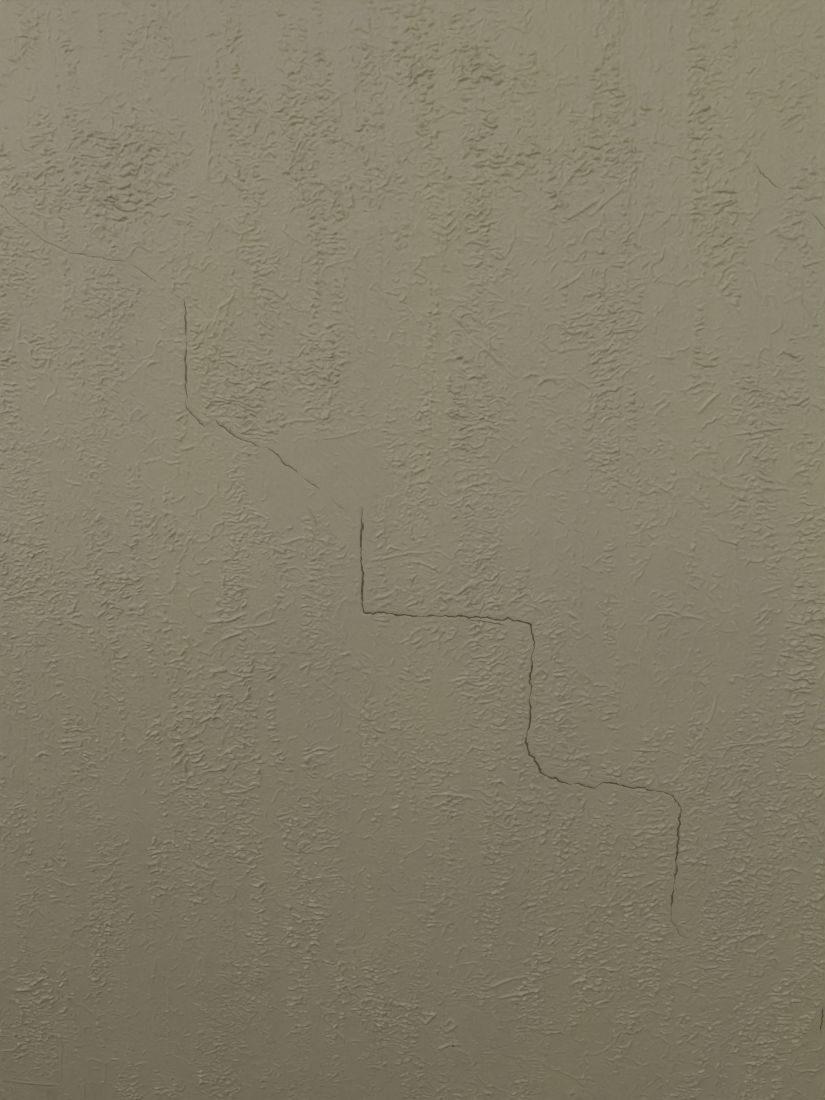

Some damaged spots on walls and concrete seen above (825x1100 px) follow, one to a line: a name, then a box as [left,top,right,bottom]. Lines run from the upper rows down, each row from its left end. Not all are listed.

crack [0,204,687,938]